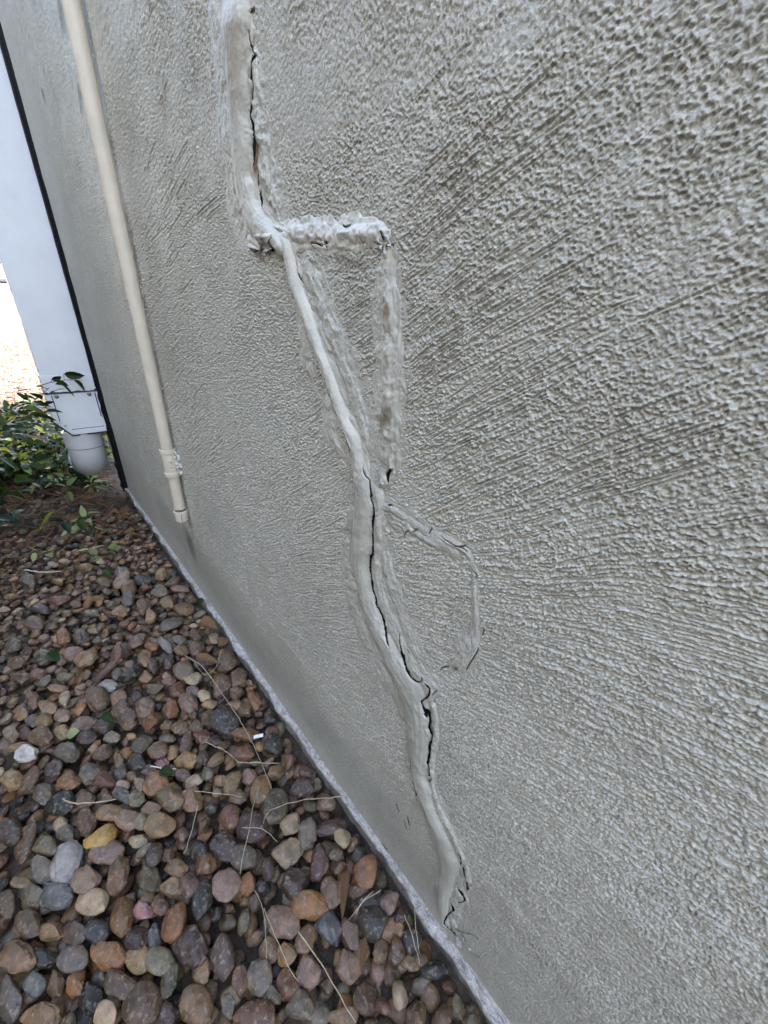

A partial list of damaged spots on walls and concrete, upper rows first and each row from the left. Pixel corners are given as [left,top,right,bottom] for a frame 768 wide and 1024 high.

crack [249,9,263,206]
crack [335,412,484,829]
crack [444,848,479,958]